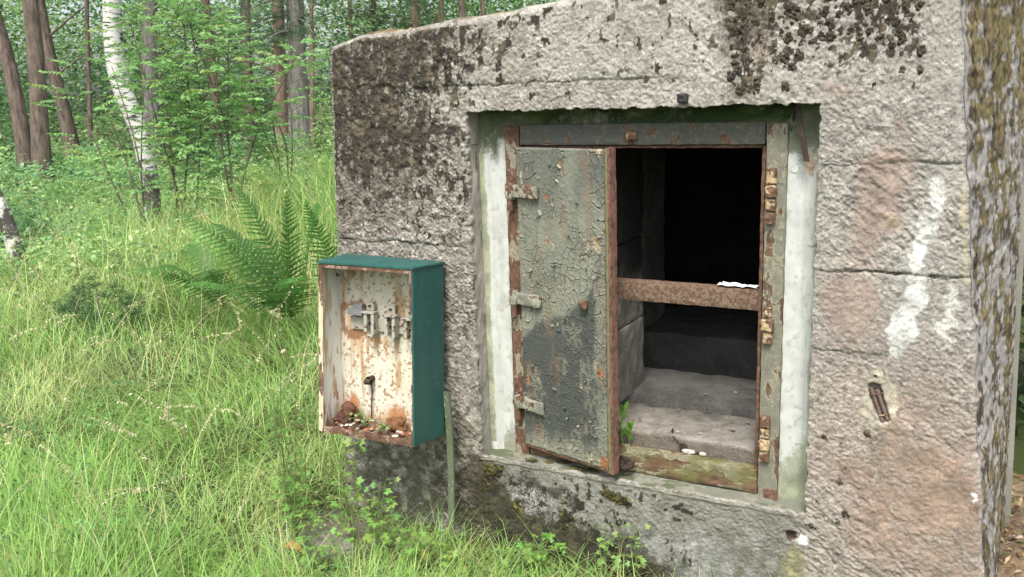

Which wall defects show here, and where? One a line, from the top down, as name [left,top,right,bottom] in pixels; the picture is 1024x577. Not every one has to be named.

damp [885,178,967,358]
spalling [856,367,899,436]
damp [435,449,697,577]